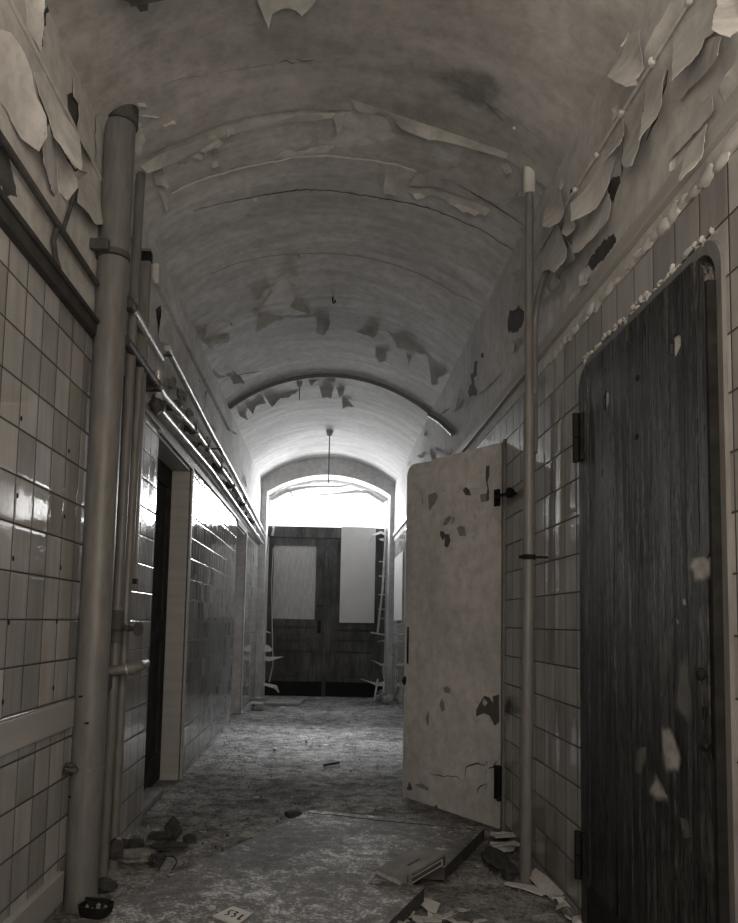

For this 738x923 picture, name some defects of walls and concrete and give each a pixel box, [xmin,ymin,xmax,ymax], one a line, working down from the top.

peeling [26,0,49,52]
peeling [0,146,17,197]
peeling [34,72,103,225]
peeling [135,99,508,173]
peeling [407,170,490,216]
flaking render [541,0,738,368]
peeling [256,271,330,335]
flaking render [505,304,524,354]
peeling [213,370,260,384]
peeling [237,390,298,420]
peeling [309,378,354,409]
peeling [356,327,448,385]